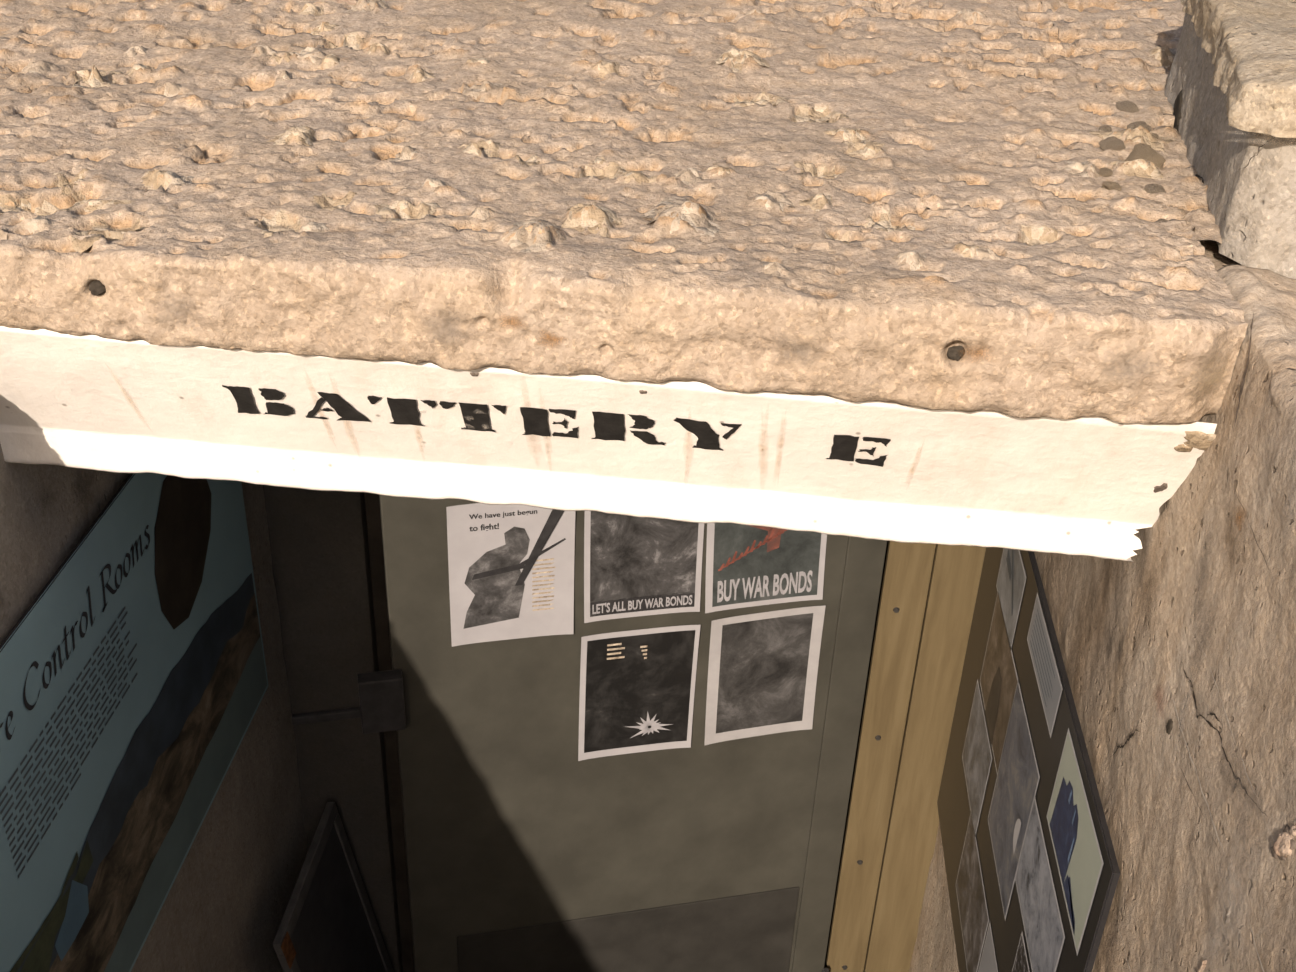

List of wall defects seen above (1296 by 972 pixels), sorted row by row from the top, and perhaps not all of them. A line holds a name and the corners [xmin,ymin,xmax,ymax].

crack [1112,729,1138,756]
crack [1180,658,1296,831]